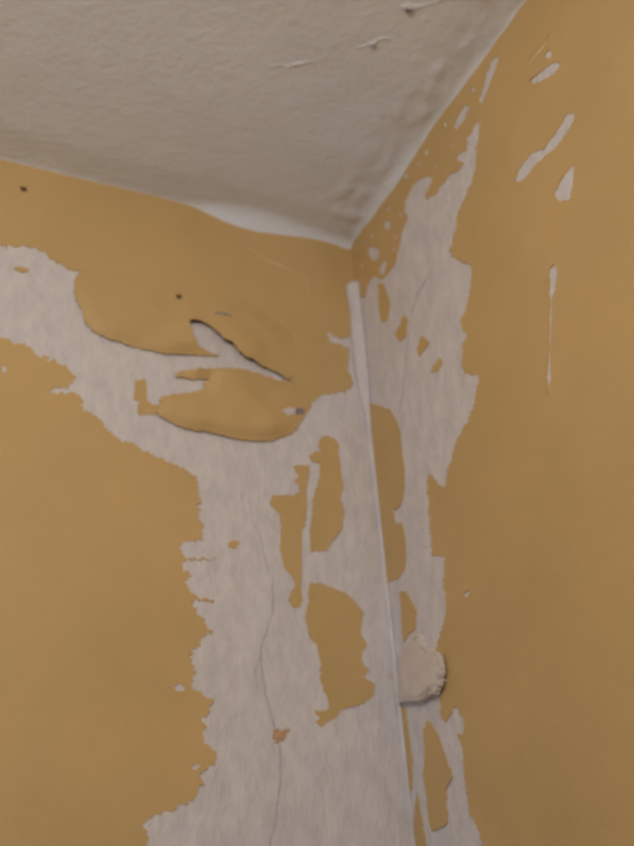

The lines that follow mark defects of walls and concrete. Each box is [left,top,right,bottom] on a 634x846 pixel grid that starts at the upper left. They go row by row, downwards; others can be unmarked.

peeling [472,56,498,103]
peeling [444,105,469,129]
peeling [516,113,574,181]
peeling [555,166,574,201]
peeling [0,120,484,846]
crack [250,517,282,846]